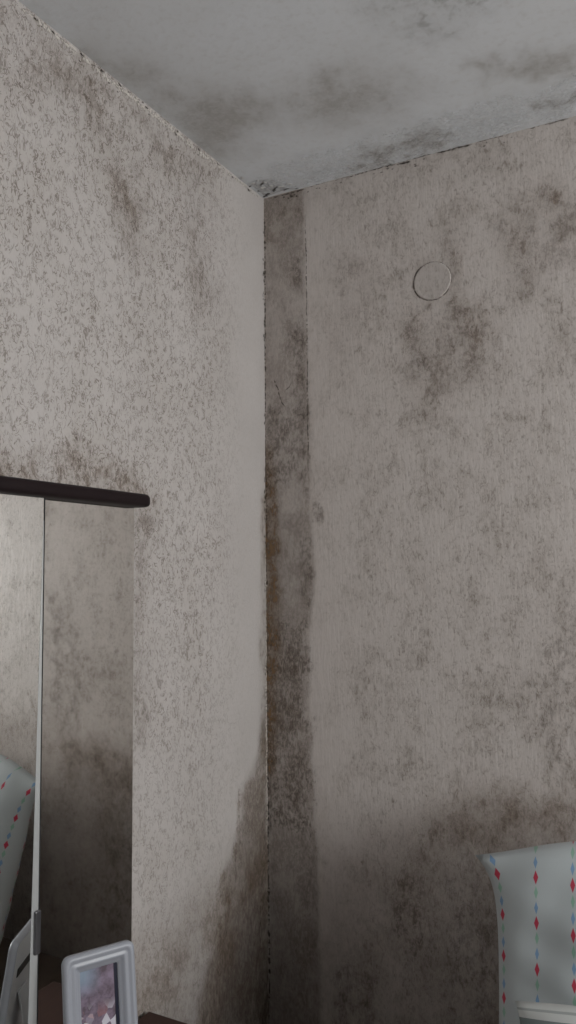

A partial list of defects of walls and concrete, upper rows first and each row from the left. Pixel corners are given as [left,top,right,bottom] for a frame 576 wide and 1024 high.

water stain [246,452,309,882]